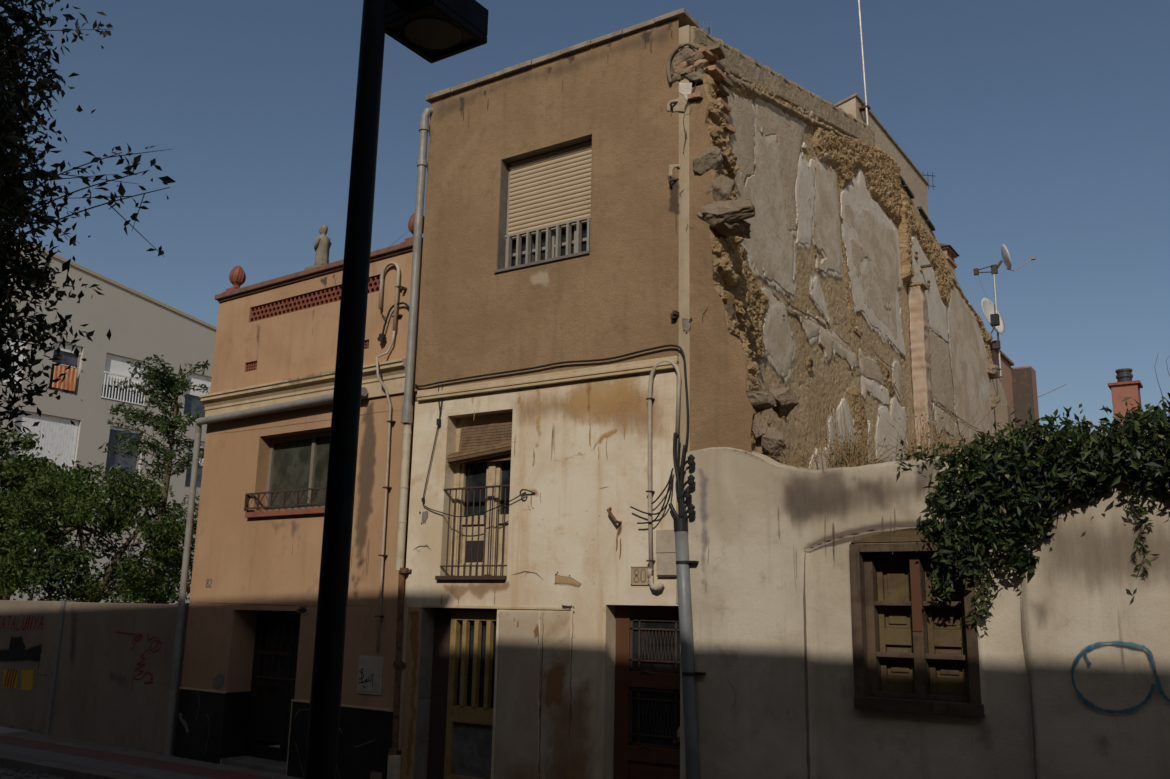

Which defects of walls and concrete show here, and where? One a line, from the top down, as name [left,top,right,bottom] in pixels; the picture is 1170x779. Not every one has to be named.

spalling [666,42,1016,470]
damp [351,405,375,575]
damp [554,379,648,458]